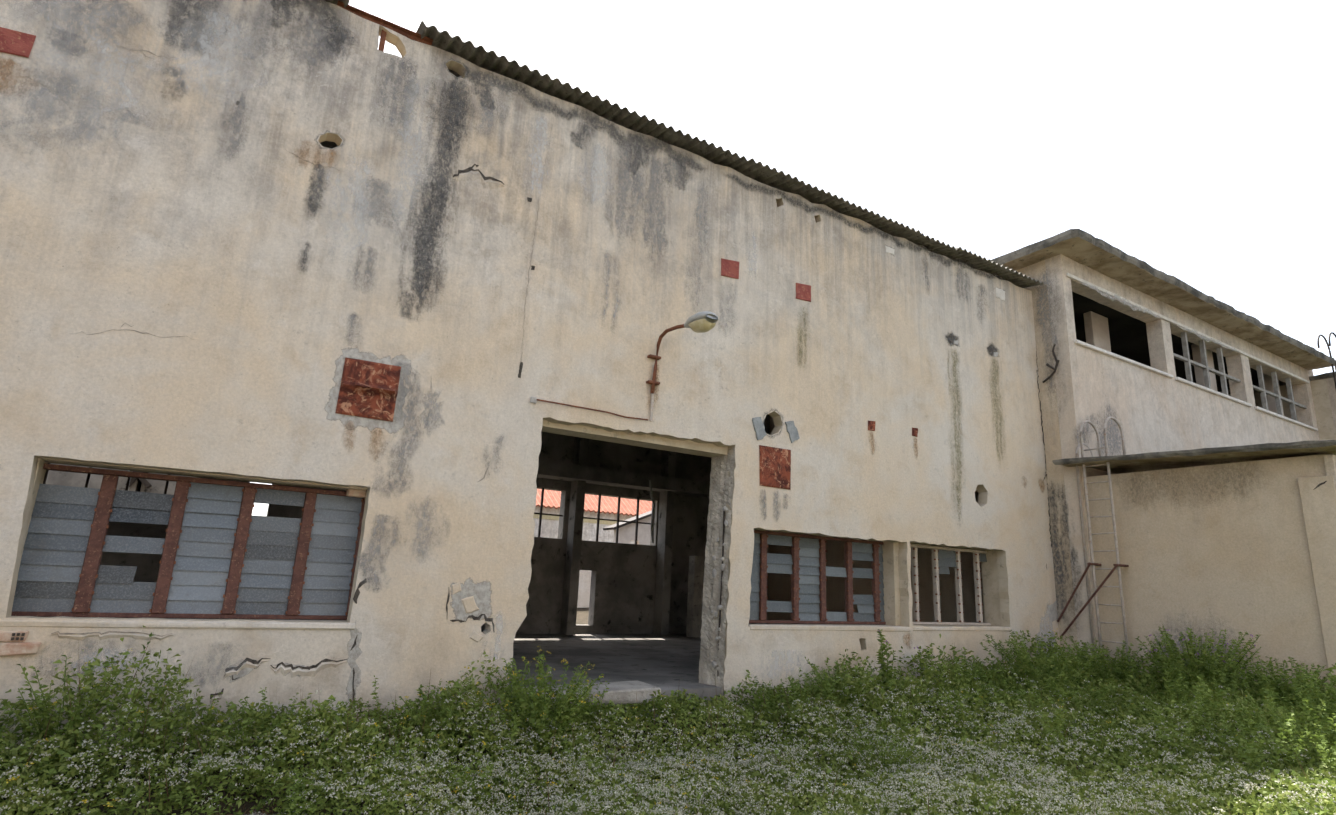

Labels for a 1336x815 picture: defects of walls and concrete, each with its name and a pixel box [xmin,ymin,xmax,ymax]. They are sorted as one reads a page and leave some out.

leakage [306,166,324,214]
leakage [339,58,494,317]
crack [452,164,504,189]
crack [76,323,196,340]
crack [353,578,367,604]
flaking render [450,578,492,642]
crack [210,636,357,704]